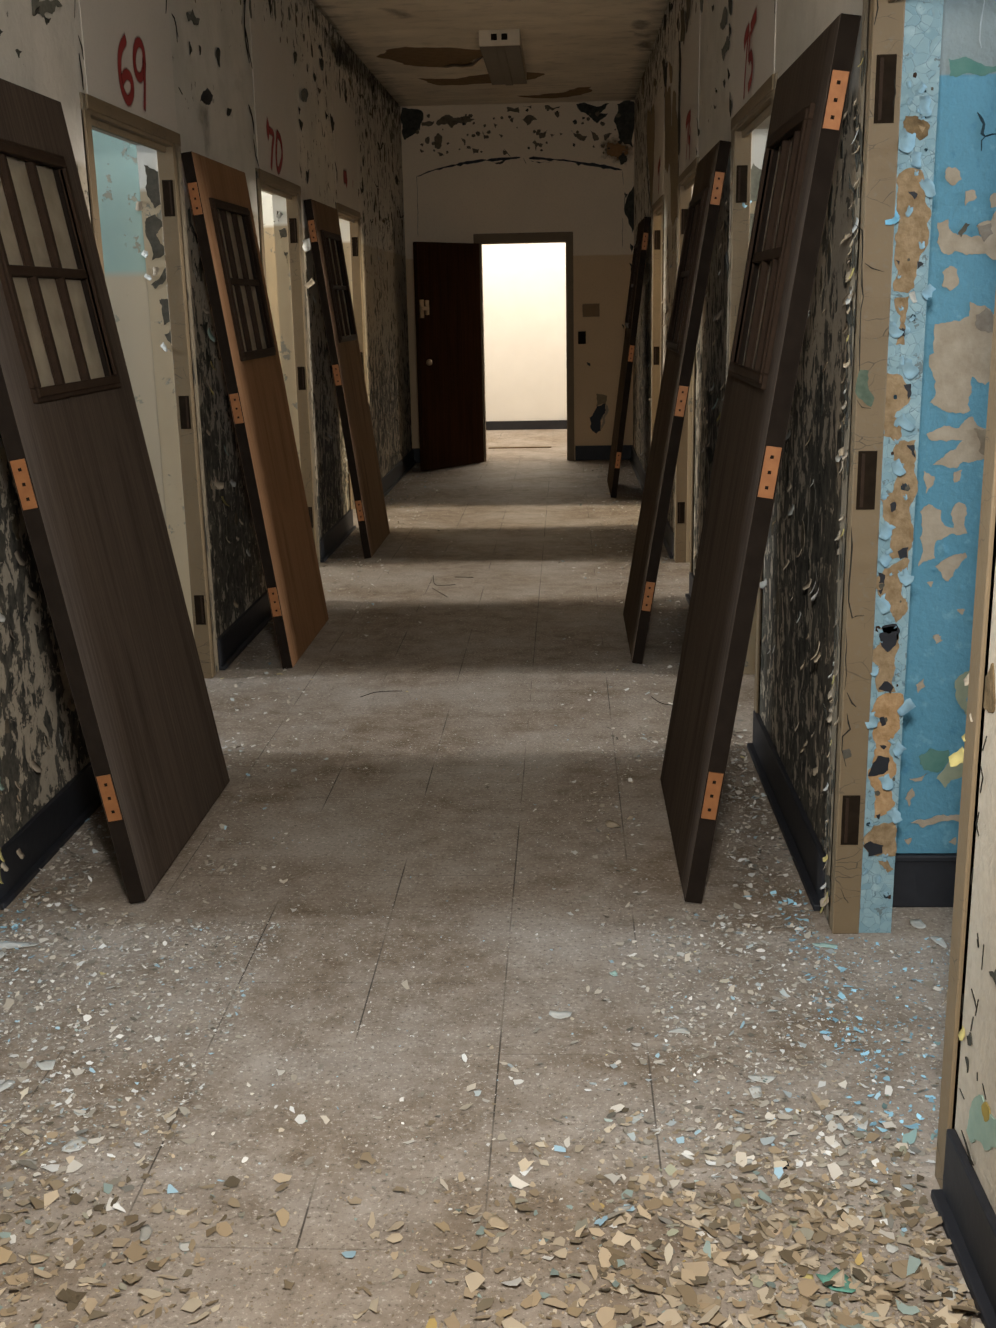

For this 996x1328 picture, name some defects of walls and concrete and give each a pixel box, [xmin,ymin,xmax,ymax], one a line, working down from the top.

peeling [32,0,62,25]
peeling [186,0,200,25]
flaking render [200,88,213,105]
peeling [135,165,171,352]
flaking render [268,0,732,615]
peeling [695,163,762,514]
peeling [760,460,819,623]
peeling [0,534,985,1328]
peeling [966,1094,996,1150]